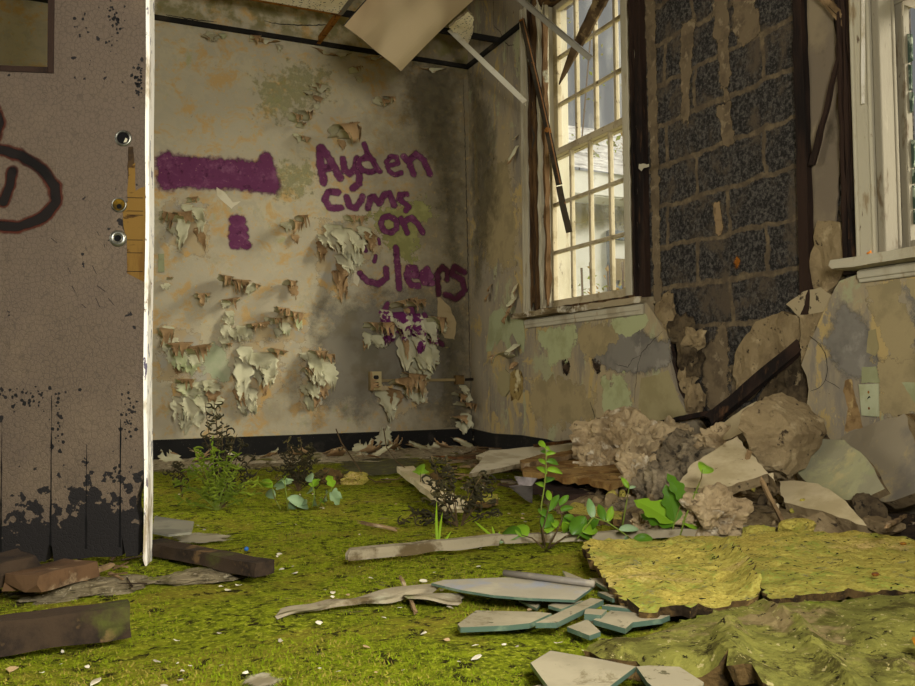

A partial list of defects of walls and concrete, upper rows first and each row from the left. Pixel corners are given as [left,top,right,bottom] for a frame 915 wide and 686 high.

peeling [157,196,210,260]
peeling [216,188,240,209]
peeling [280,214,384,305]
peeling [476,136,525,401]
peeling [156,274,339,435]
peeling [362,296,456,423]
peeling [450,384,477,435]
peeling [537,323,578,376]
peeling [610,313,649,337]
peeling [591,358,687,421]
spalling [843,379,863,432]
peeling [866,329,915,418]